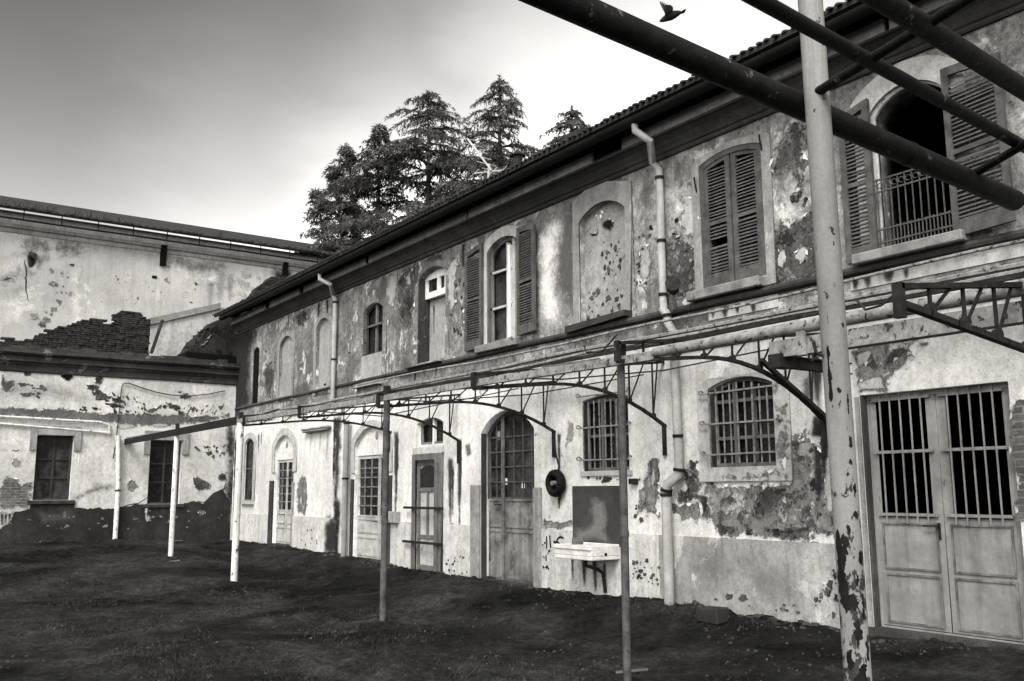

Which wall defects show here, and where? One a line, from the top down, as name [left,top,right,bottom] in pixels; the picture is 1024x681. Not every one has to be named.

peeling [766,119,816,288]
peeling [30,263,90,328]
peeling [587,241,623,320]
peeling [636,225,653,285]
peeling [665,194,703,303]
peeling [0,371,230,429]
peeling [852,340,918,392]
flaking render [0,458,33,529]
leakage [325,417,341,553]
flaking render [1009,399,1024,521]
peeling [632,403,869,681]